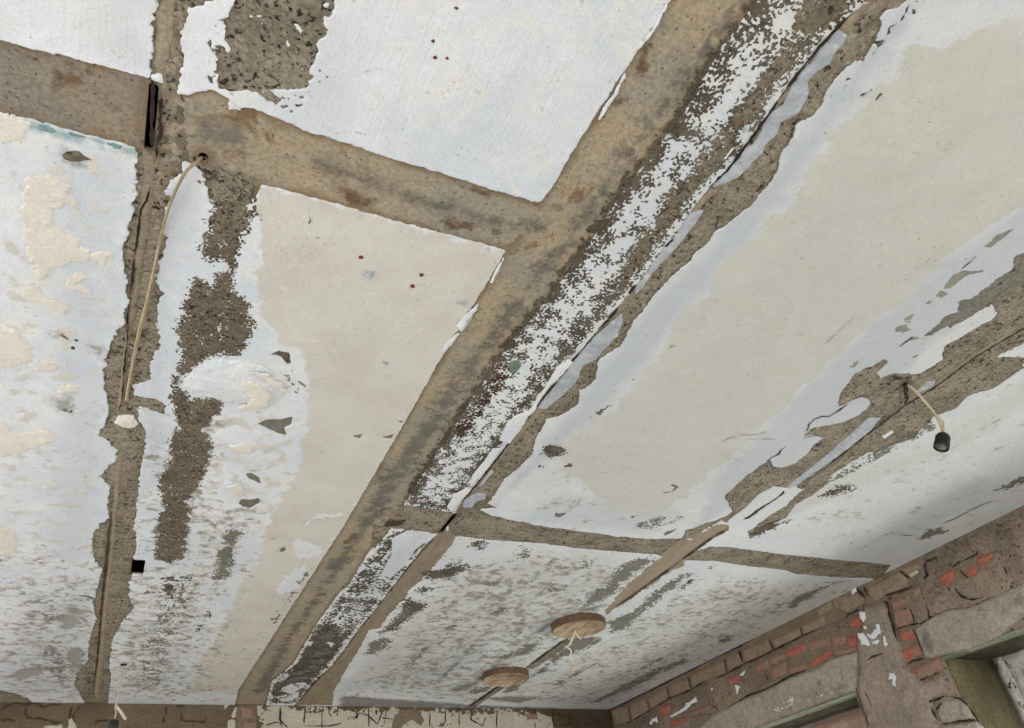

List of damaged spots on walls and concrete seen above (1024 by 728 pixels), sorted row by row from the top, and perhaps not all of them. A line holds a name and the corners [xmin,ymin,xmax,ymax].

peeling [0,0,564,703]
peeling [208,0,1024,728]
damp [267,529,471,704]
damp [340,567,712,708]
damp [581,555,656,611]
damp [749,519,791,538]
crack [846,550,989,726]